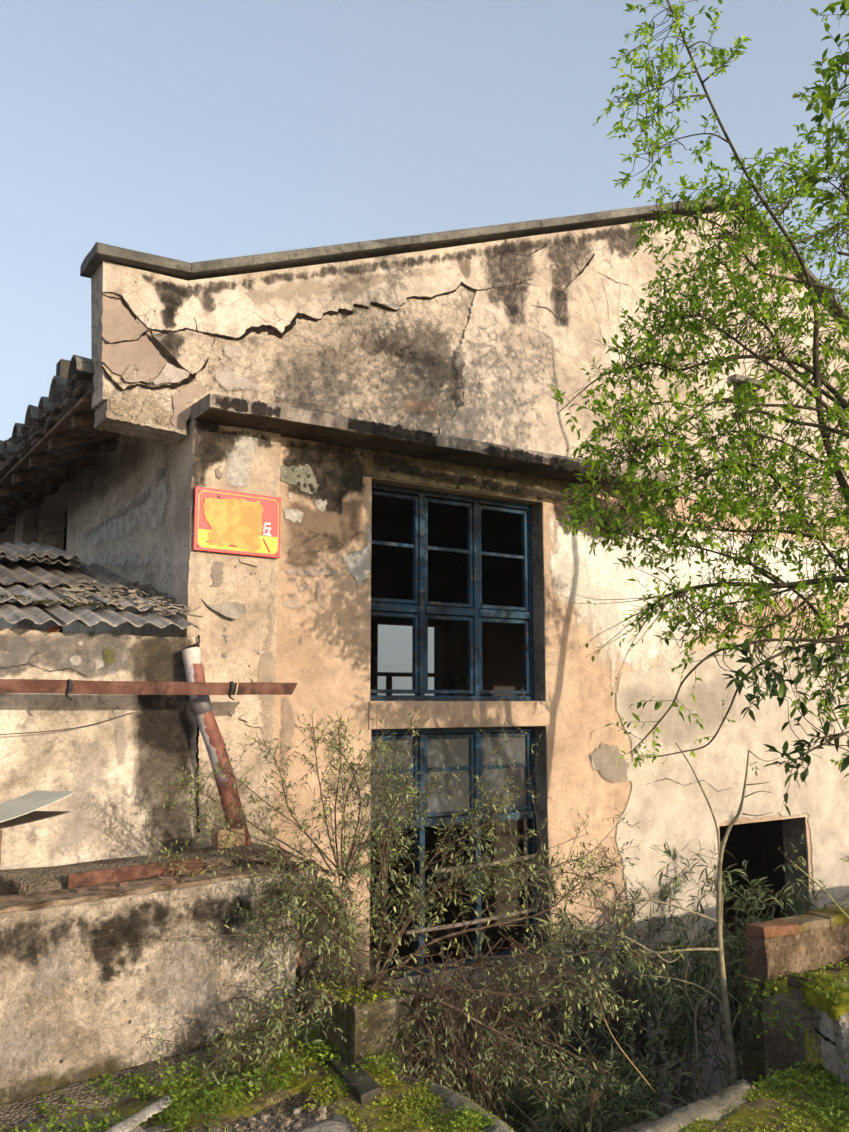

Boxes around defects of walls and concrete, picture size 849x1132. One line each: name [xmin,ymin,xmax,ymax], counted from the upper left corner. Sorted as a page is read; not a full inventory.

spalling [100,294,214,434]
leakage [215,344,297,417]
crack [101,238,627,391]
leakage [328,402,437,445]
leakage [143,222,644,359]
spalling [360,319,466,406]
leakage [192,421,668,567]
peeling [228,518,371,797]
peeling [549,517,849,687]
leakage [0,630,193,854]
leakage [0,885,295,982]